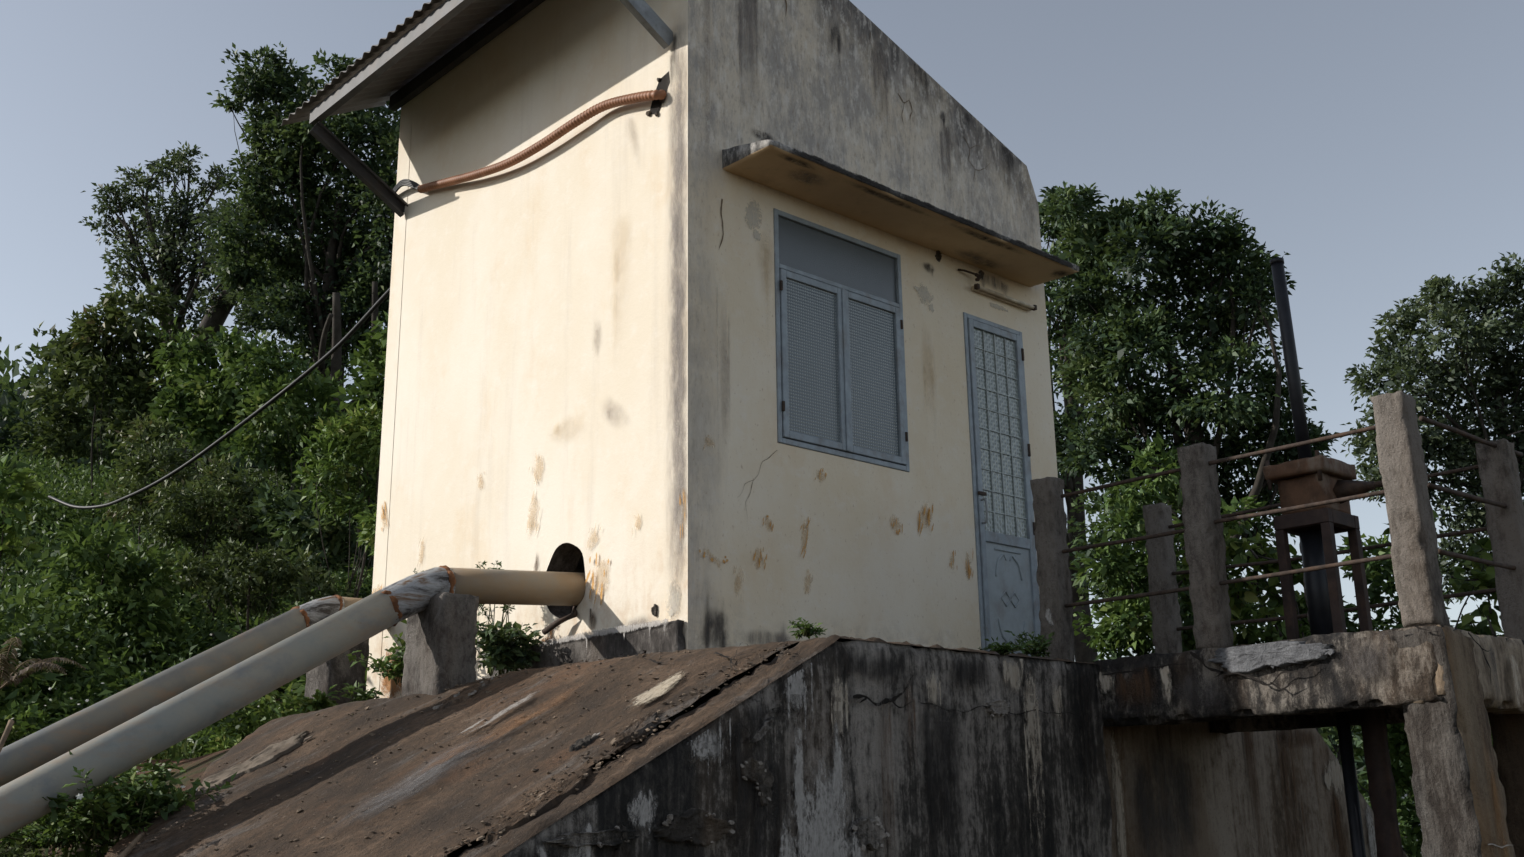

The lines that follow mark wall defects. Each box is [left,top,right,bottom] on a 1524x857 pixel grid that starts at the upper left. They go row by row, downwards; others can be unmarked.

leakage [785,148,1073,288]
leakage [672,92,686,549]
spalling [476,710,661,846]
efflorescence [628,790,656,830]
leakage [632,673,681,705]
leakage [691,710,754,765]
spalling [740,717,775,807]
leakage [780,648,905,857]
spalling [849,816,890,852]
leakage [1003,659,1062,809]
leakage [1111,733,1127,857]
leakage [1324,759,1358,794]